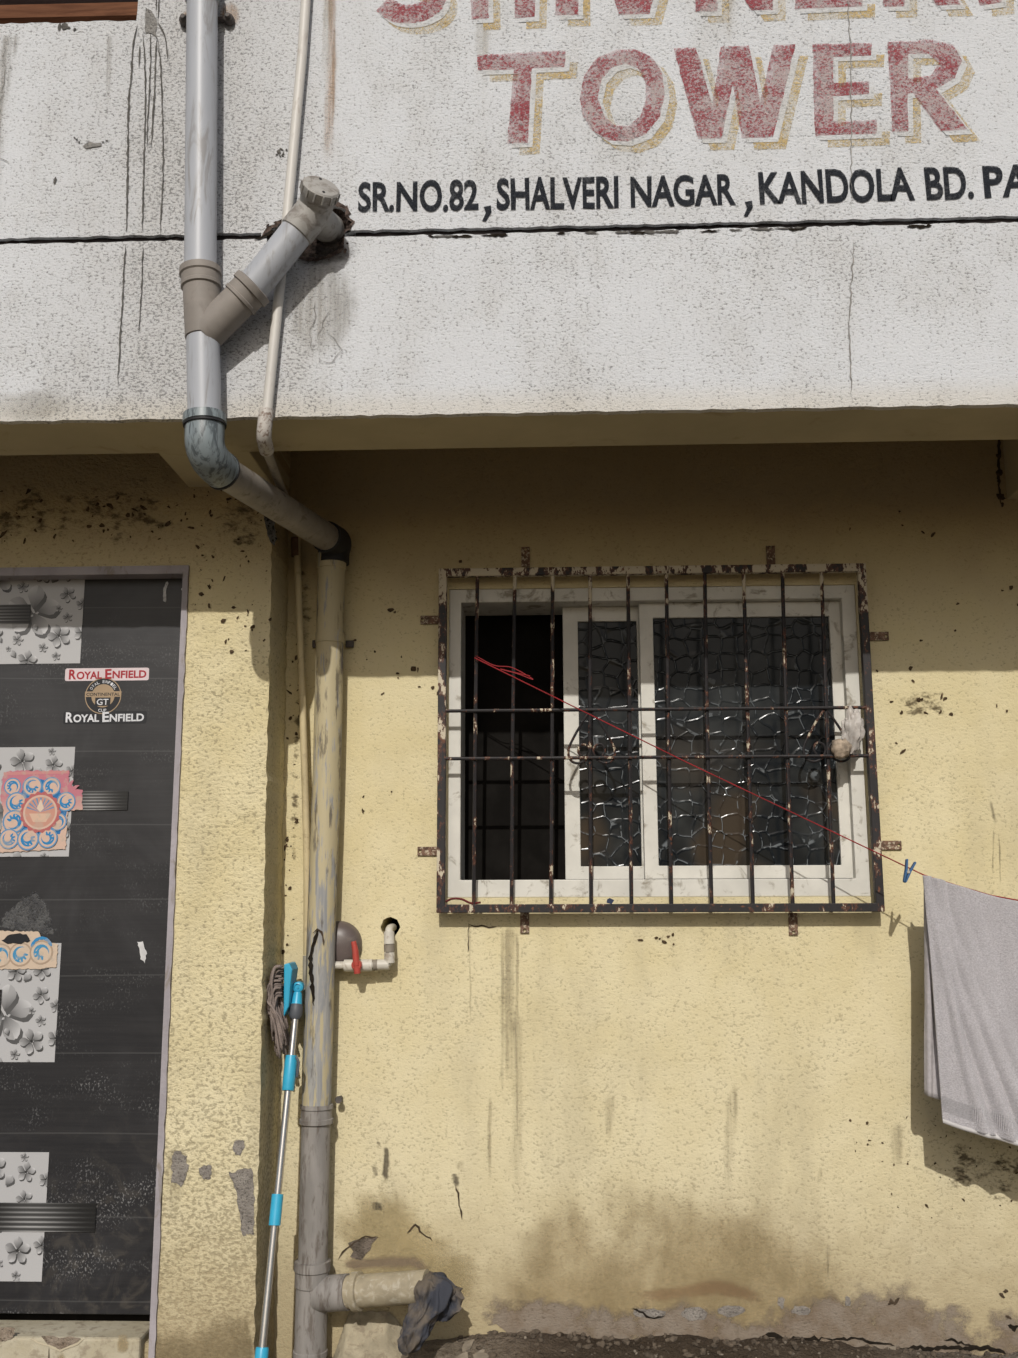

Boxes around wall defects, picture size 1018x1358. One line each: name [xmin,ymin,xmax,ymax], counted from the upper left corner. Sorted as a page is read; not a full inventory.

damp [117,0,168,378]
damp [0,489,262,566]
flaking render [171,1151,212,1187]
flaking render [229,1140,255,1236]